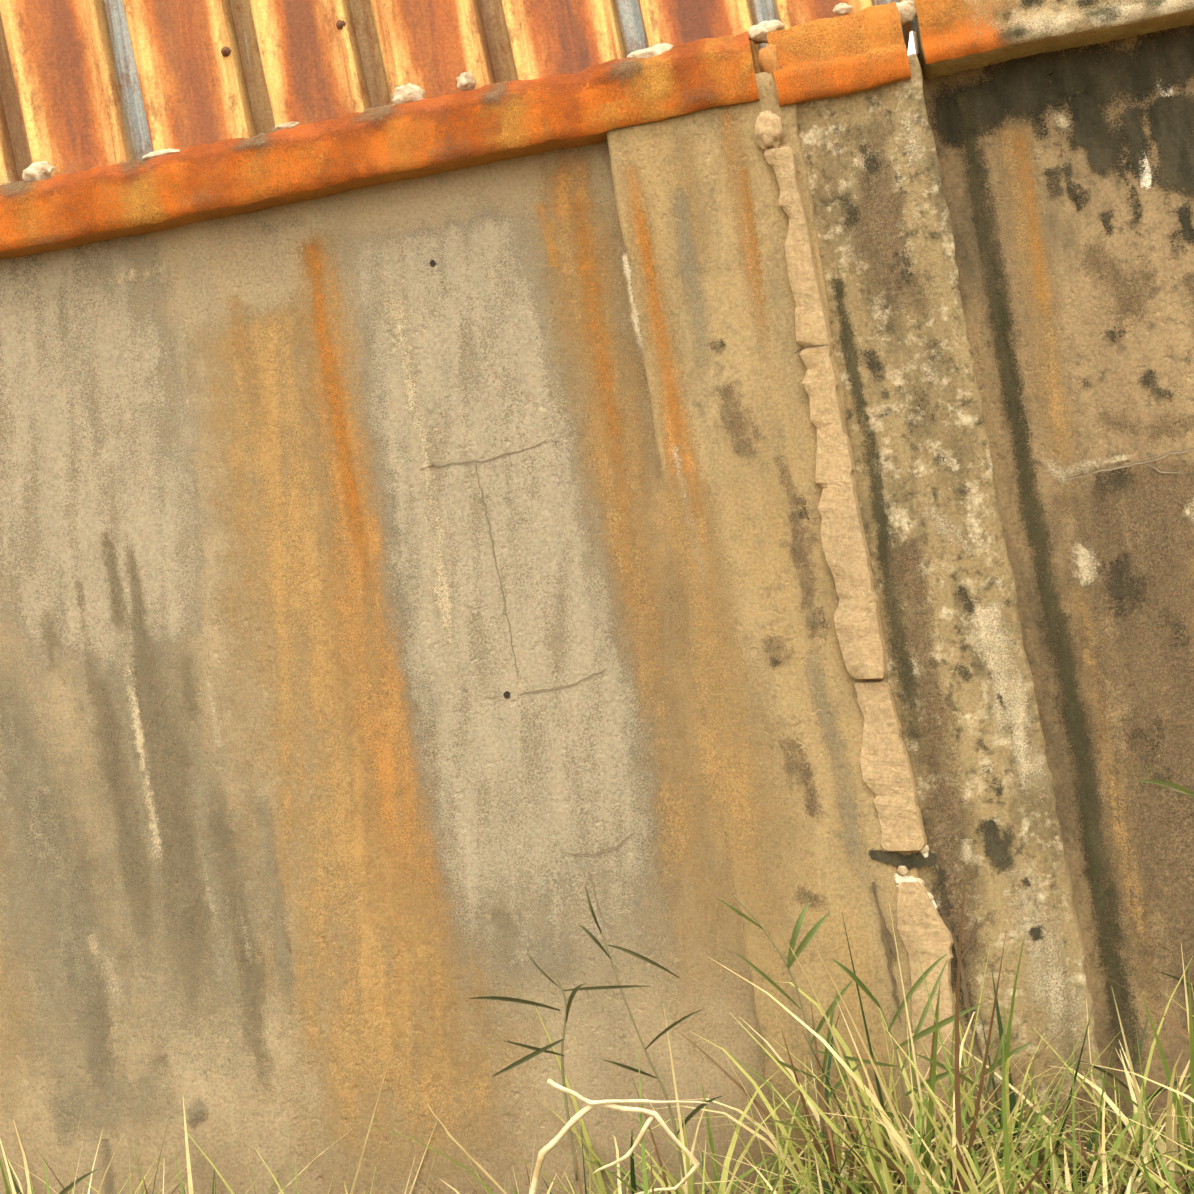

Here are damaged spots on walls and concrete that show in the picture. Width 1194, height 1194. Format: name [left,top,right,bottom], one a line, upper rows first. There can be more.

rust [0,31,759,251]
rust [767,2,911,105]
rust [914,0,1012,64]
rust [191,229,534,1194]
crack [420,441,606,695]
damp [774,455,865,883]
damp [832,277,985,1025]
damp [929,25,1194,1072]
crack [1065,448,1194,479]
damp [0,534,292,1194]
crack [566,833,634,930]
spalling [869,848,937,887]